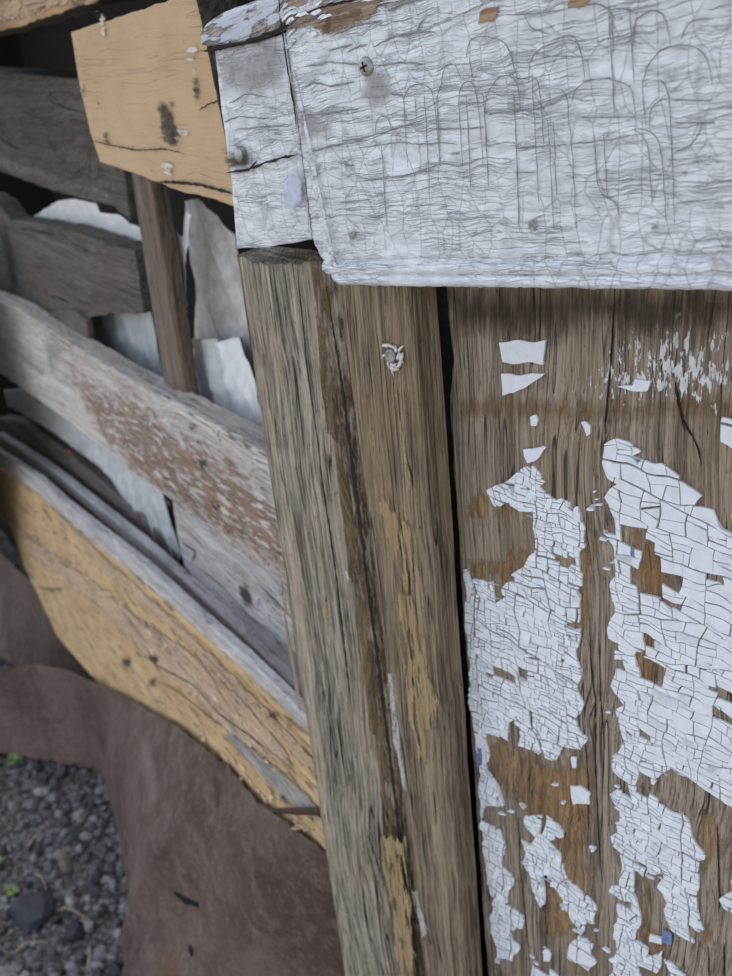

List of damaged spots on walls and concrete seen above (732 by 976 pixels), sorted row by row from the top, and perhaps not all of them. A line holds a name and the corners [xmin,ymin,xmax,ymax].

peeling [281,0,399,49]
peeling [439,0,498,24]
crack [156,0,715,231]
crack [84,140,184,178]
peeling [471,339,592,436]
crack [604,289,615,434]
peeling [617,378,652,392]
crack [674,381,701,462]
peeling [710,405,732,448]
peeling [463,438,732,976]
rust [0,552,345,976]